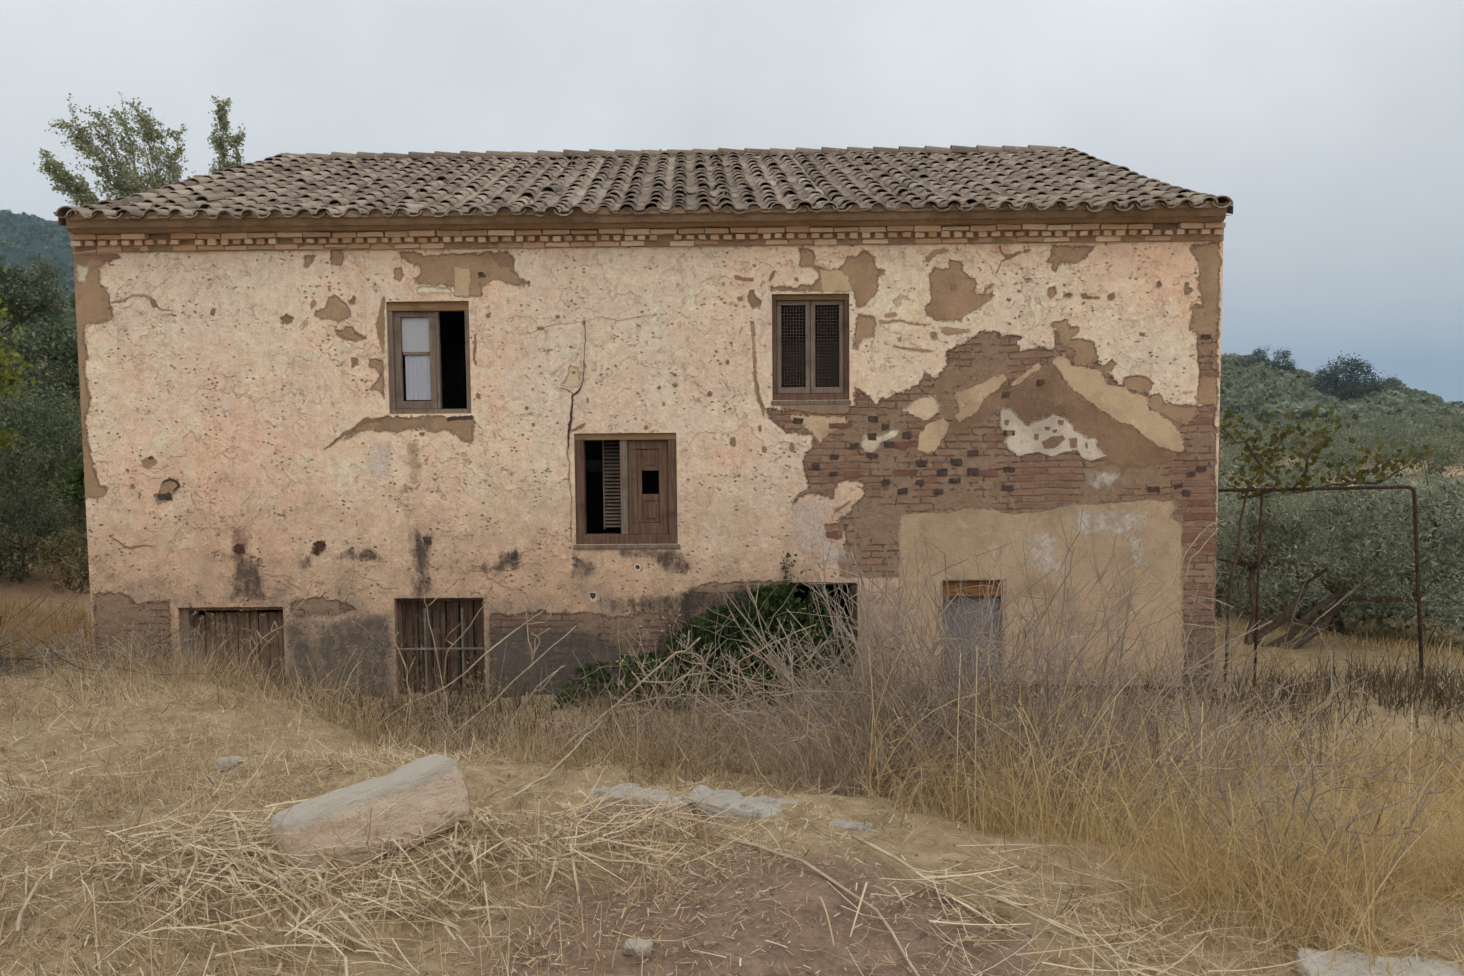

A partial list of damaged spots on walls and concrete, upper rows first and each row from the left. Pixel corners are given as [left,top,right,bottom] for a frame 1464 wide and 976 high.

spalling [73,254,122,500]
spalling [279,313,294,325]
spalling [303,250,344,268]
spalling [309,285,481,449]
peeling [393,249,530,318]
crack [520,314,656,542]
flaking render [734,242,1223,693]
leakage [414,531,432,592]
leakage [481,550,519,570]
leakage [91,590,172,674]
leakage [289,596,390,698]
leakage [488,578,788,698]